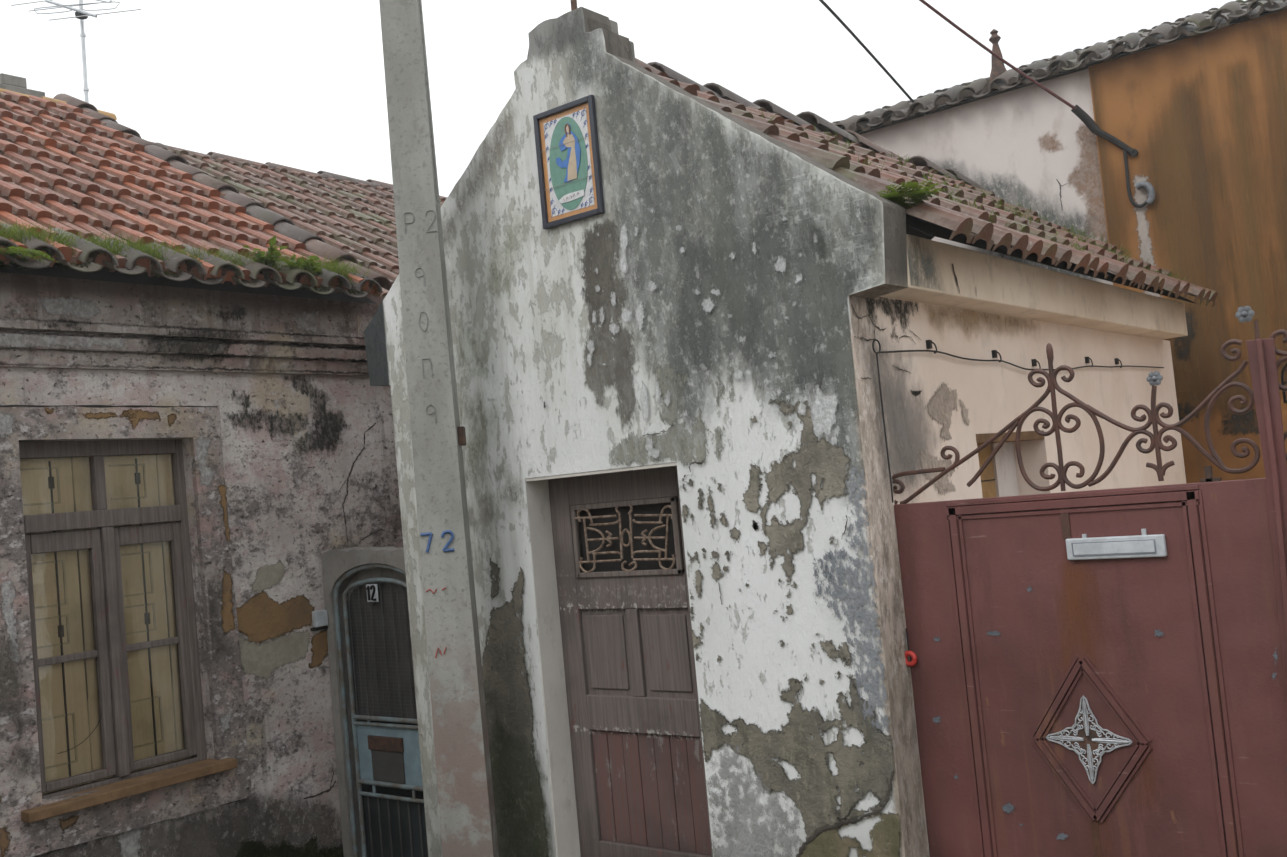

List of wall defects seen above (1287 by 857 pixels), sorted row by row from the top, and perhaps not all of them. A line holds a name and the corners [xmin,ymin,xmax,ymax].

peeling [592,268,657,335]
peeling [619,224,638,273]
peeling [695,289,721,312]
peeling [774,253,803,284]
damp [569,20,1026,485]
peeling [587,340,606,367]
spalling [75,408,177,429]
damp [227,375,347,454]
crack [338,423,382,547]
spalling [221,571,328,669]
peeling [610,364,901,857]
damp [489,726,551,857]